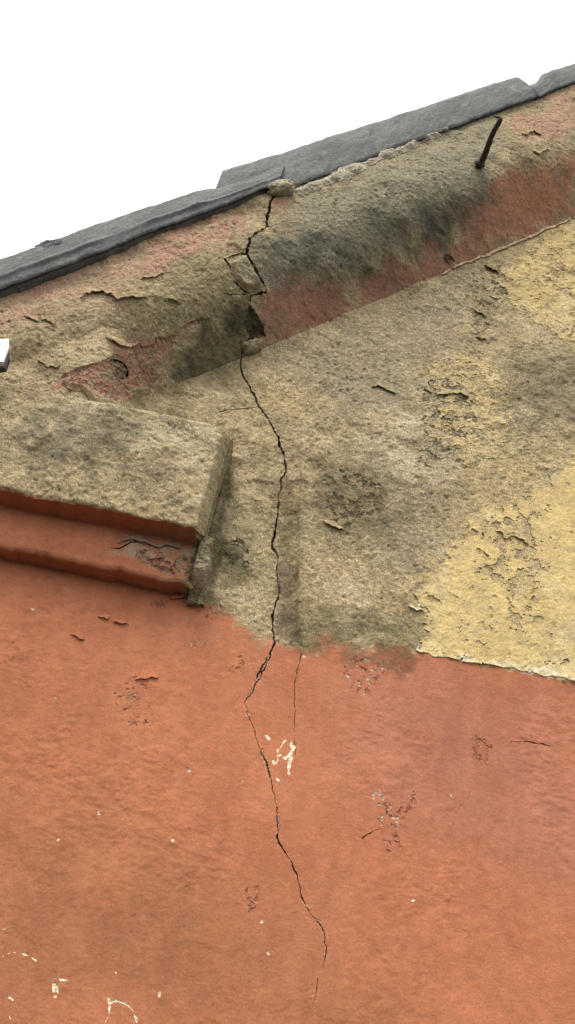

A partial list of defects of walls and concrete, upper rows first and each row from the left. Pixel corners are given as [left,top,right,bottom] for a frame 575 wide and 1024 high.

flaking render [80,270,182,304]
crack [223,196,275,298]
peeling [37,318,205,408]
leakage [172,308,256,381]
spalling [117,536,196,583]
peeling [409,452,575,681]
crack [219,337,329,1007]
spalling [372,791,419,852]